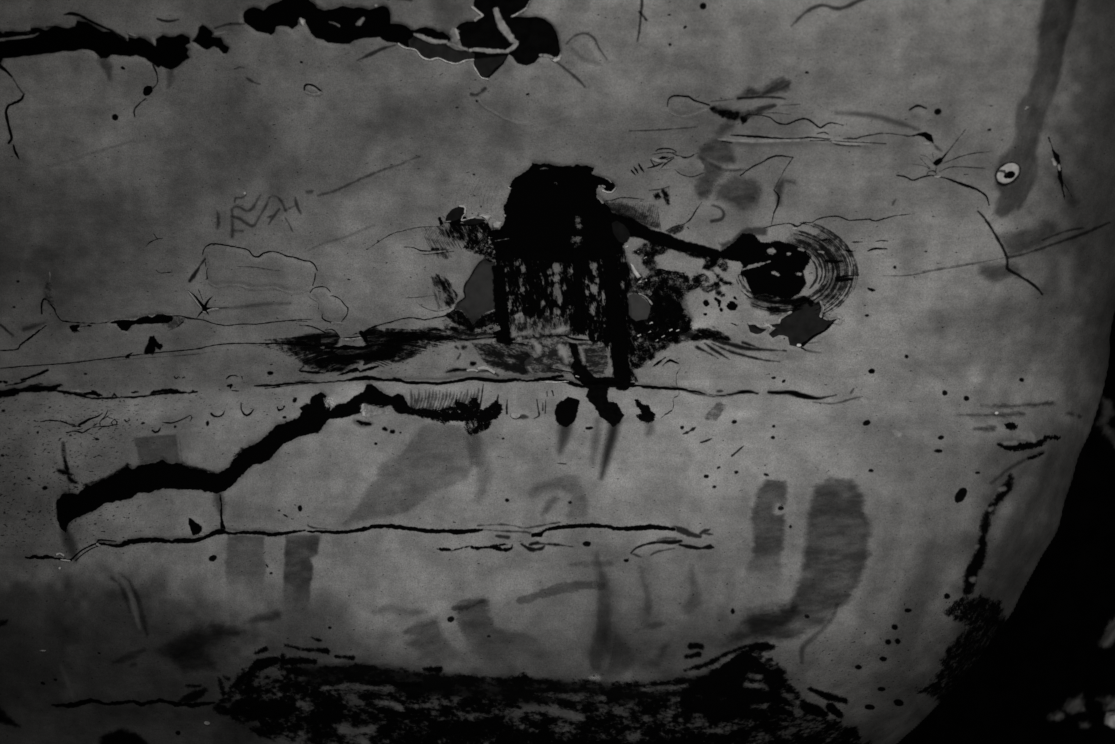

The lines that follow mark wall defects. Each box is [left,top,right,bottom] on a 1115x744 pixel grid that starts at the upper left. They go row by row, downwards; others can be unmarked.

spalling [0,12,229,70]
spalling [243,0,561,80]
spalling [438,205,506,229]
crack [720,112,1043,295]
spalling [454,258,495,324]
spalling [626,246,679,341]
spalling [748,299,844,351]
crack [0,295,455,435]
crack [226,367,587,391]
crack [629,372,854,415]
crack [25,494,714,561]
damp [736,481,866,639]